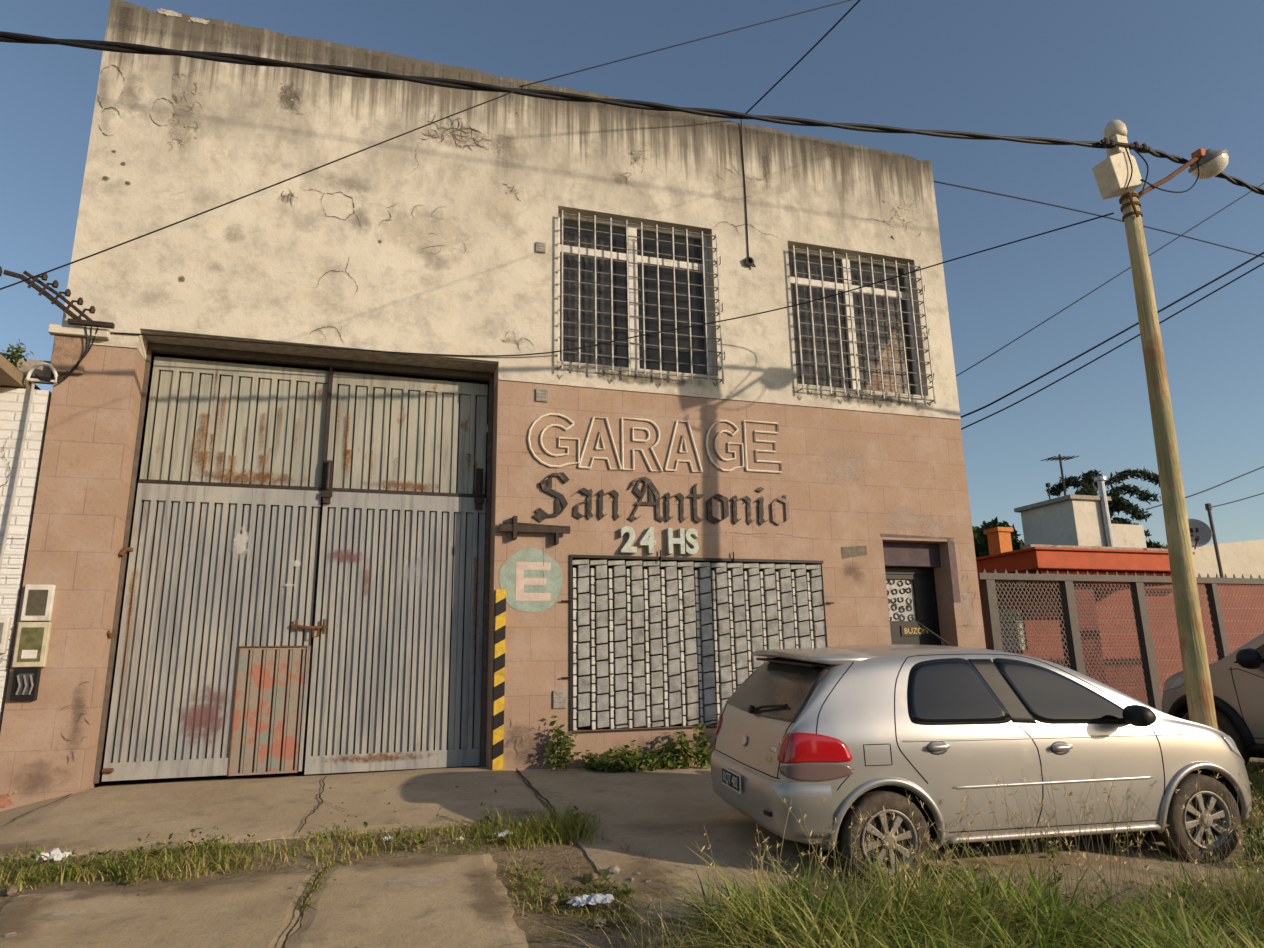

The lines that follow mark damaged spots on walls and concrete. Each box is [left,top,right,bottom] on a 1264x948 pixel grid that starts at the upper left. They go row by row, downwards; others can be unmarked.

crack [286,189,361,227]
corrosion [193,373,291,484]
corrosion [337,403,351,468]